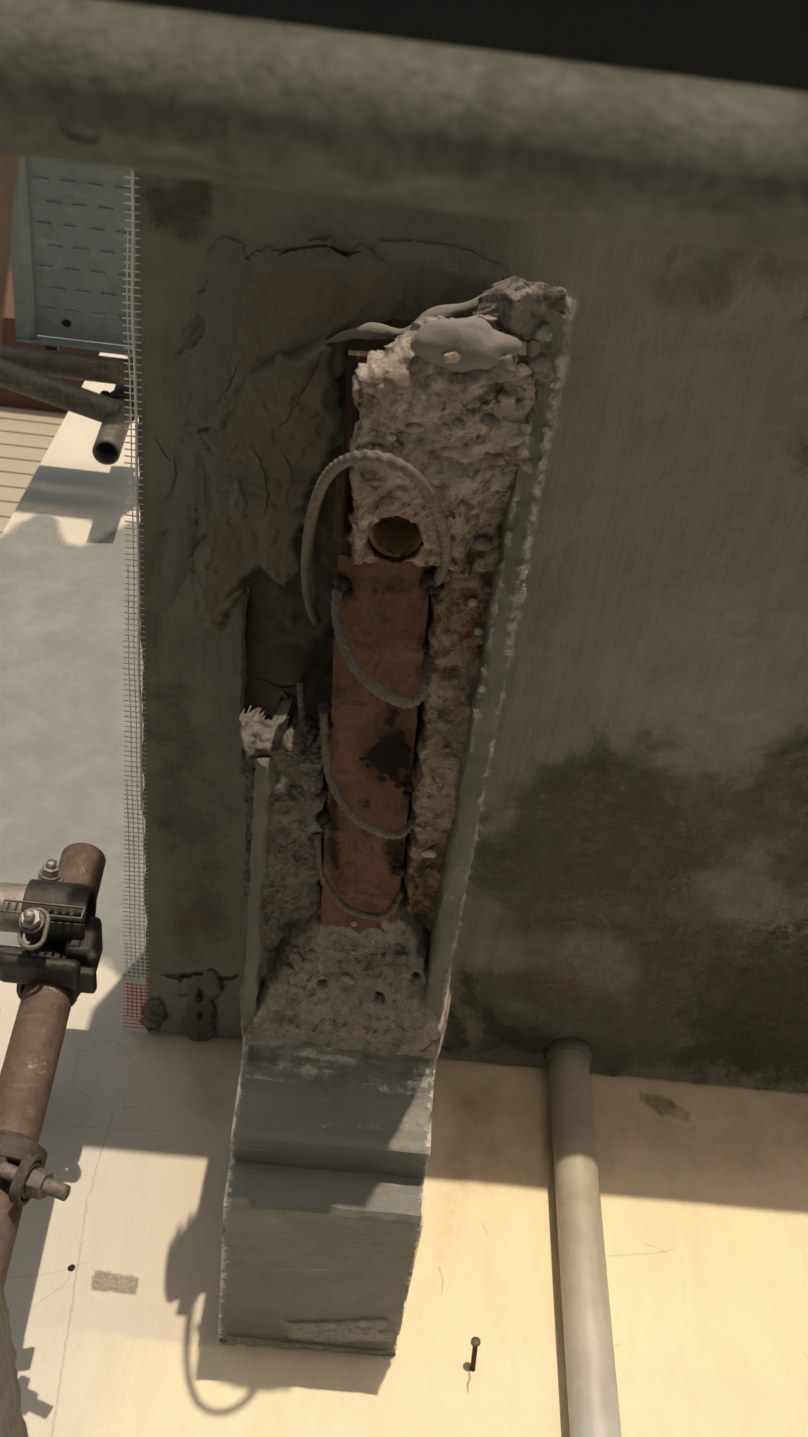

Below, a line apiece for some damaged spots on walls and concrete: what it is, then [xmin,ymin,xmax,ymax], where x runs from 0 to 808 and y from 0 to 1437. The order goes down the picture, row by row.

spalling [139,276,579,1355]
leakage [441,734,808,1085]